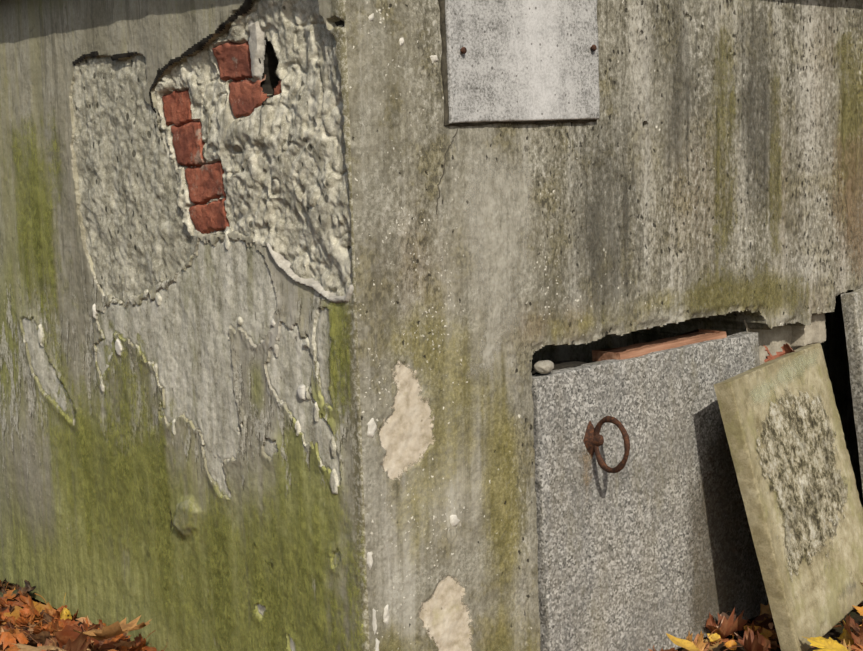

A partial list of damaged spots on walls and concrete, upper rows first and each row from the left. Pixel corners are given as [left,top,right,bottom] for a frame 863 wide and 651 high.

crack [436,129,458,215]
flaking render [71,0,354,498]
peeling [22,318,76,426]
peeling [367,361,436,481]
peeling [418,576,473,651]